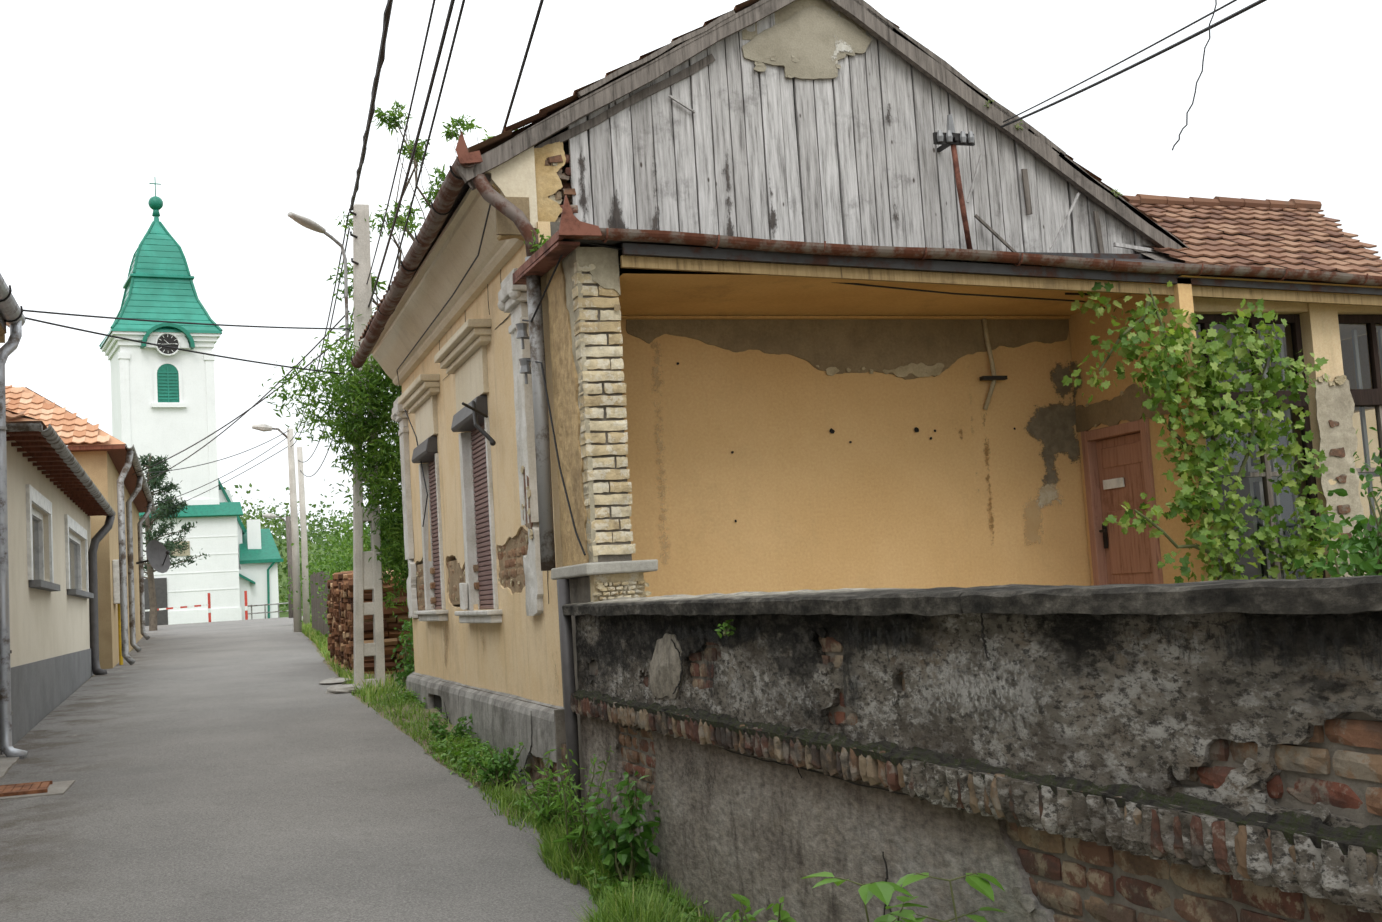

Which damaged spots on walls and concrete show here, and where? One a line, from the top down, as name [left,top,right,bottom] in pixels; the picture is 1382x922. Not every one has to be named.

flaking render [741,6,872,80]
spalling [534,144,578,222]
flaking render [626,319,1069,380]
flaking render [1075,384,1171,432]
spalling [1315,374,1367,577]
flaking render [497,466,533,593]
flaking render [416,560,480,616]
flaking render [1161,712,1382,825]